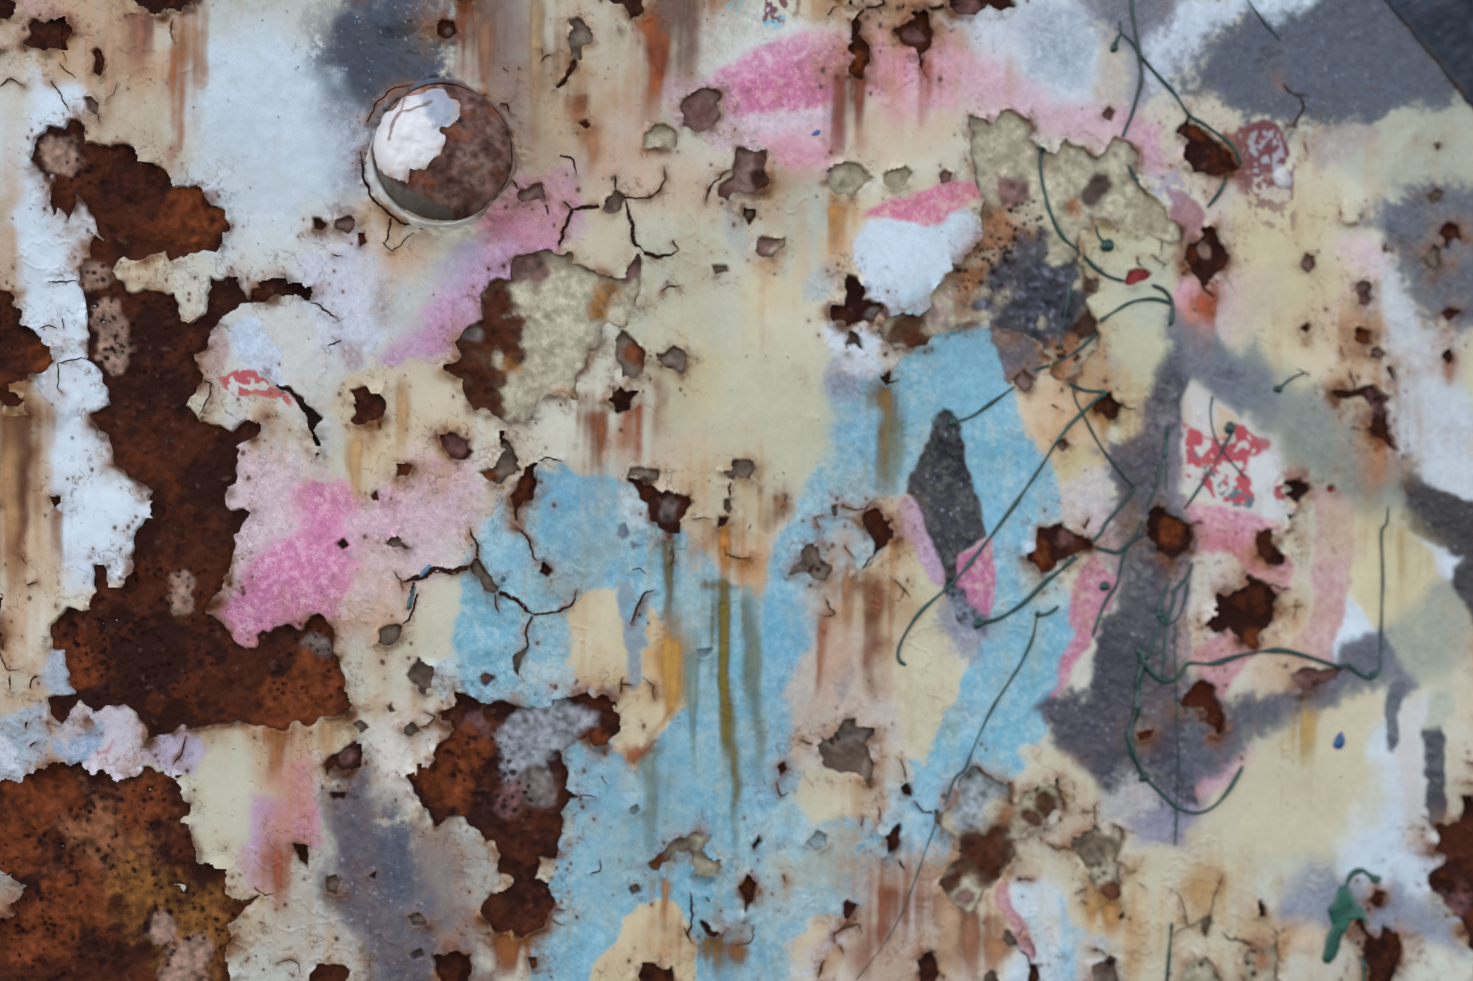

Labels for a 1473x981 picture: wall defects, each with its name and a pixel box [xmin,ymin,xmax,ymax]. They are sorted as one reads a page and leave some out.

corrosion [1172,118,1240,181]
crack [511,154,679,292]
peeling [844,104,1182,389]
peeling [435,243,694,490]
peeling [1014,371,1035,393]
corrosion [0,120,371,981]
crack [395,529,479,624]
crack [519,530,537,561]
crack [494,588,578,651]
corrosion [1198,529,1292,649]
corrosion [399,682,648,969]
corrosion [1424,789,1473,951]